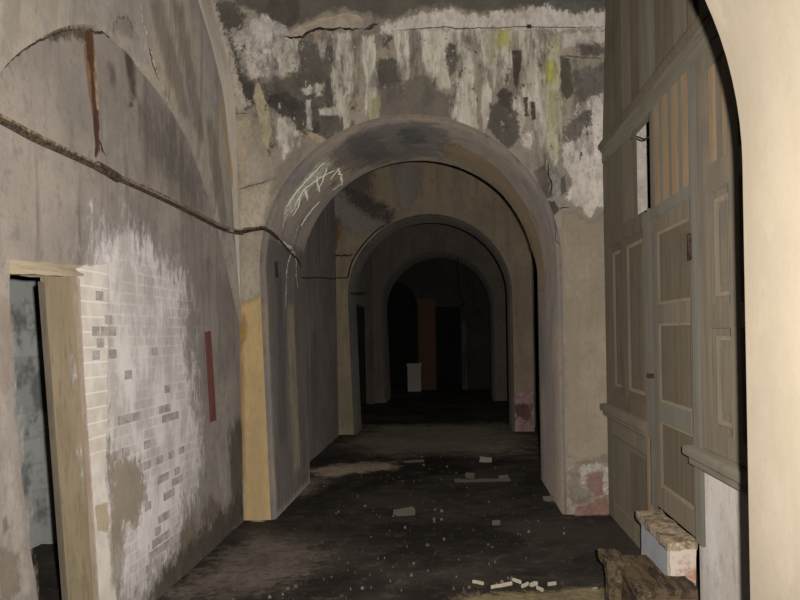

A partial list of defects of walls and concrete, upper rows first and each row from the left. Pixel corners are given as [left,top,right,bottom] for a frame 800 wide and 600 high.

crack [2,25,110,70]
corrosion [47,27,107,157]
peeling [210,0,354,188]
crack [284,23,379,54]
damp [236,0,606,169]
peeling [373,34,479,117]
crack [397,23,603,31]
peeling [487,28,605,245]
peeling [636,122,651,214]
peeling [72,197,205,600]
damp [107,448,148,584]